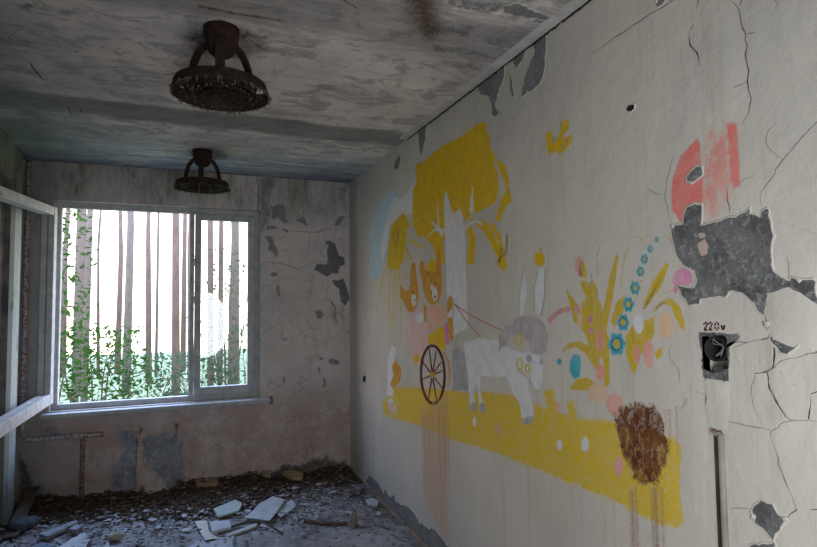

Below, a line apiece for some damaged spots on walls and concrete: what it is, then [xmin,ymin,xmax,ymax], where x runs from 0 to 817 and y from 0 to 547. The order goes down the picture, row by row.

damp [391,0,507,61]
peeling [478,35,547,118]
crack [590,0,673,55]
crack [734,0,755,123]
crack [727,122,817,211]
peeling [263,203,308,258]
peeling [313,239,350,307]
spalling [670,201,817,510]
peeling [366,475,451,547]
peeling [749,498,789,547]